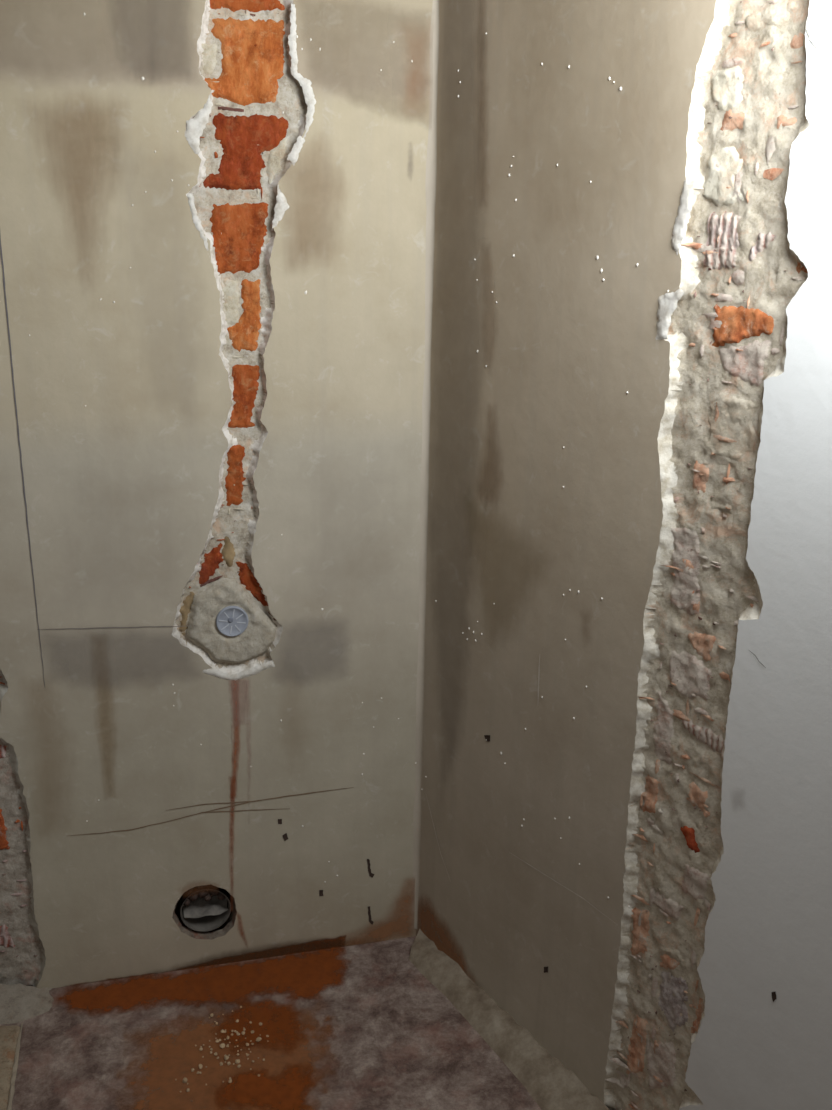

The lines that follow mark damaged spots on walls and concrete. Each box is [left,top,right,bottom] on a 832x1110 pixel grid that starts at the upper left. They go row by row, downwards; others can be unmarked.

spalling [0,670,8,712]
spalling [0,738,46,987]
spalling [172,0,316,681]
spalling [604,0,810,1110]